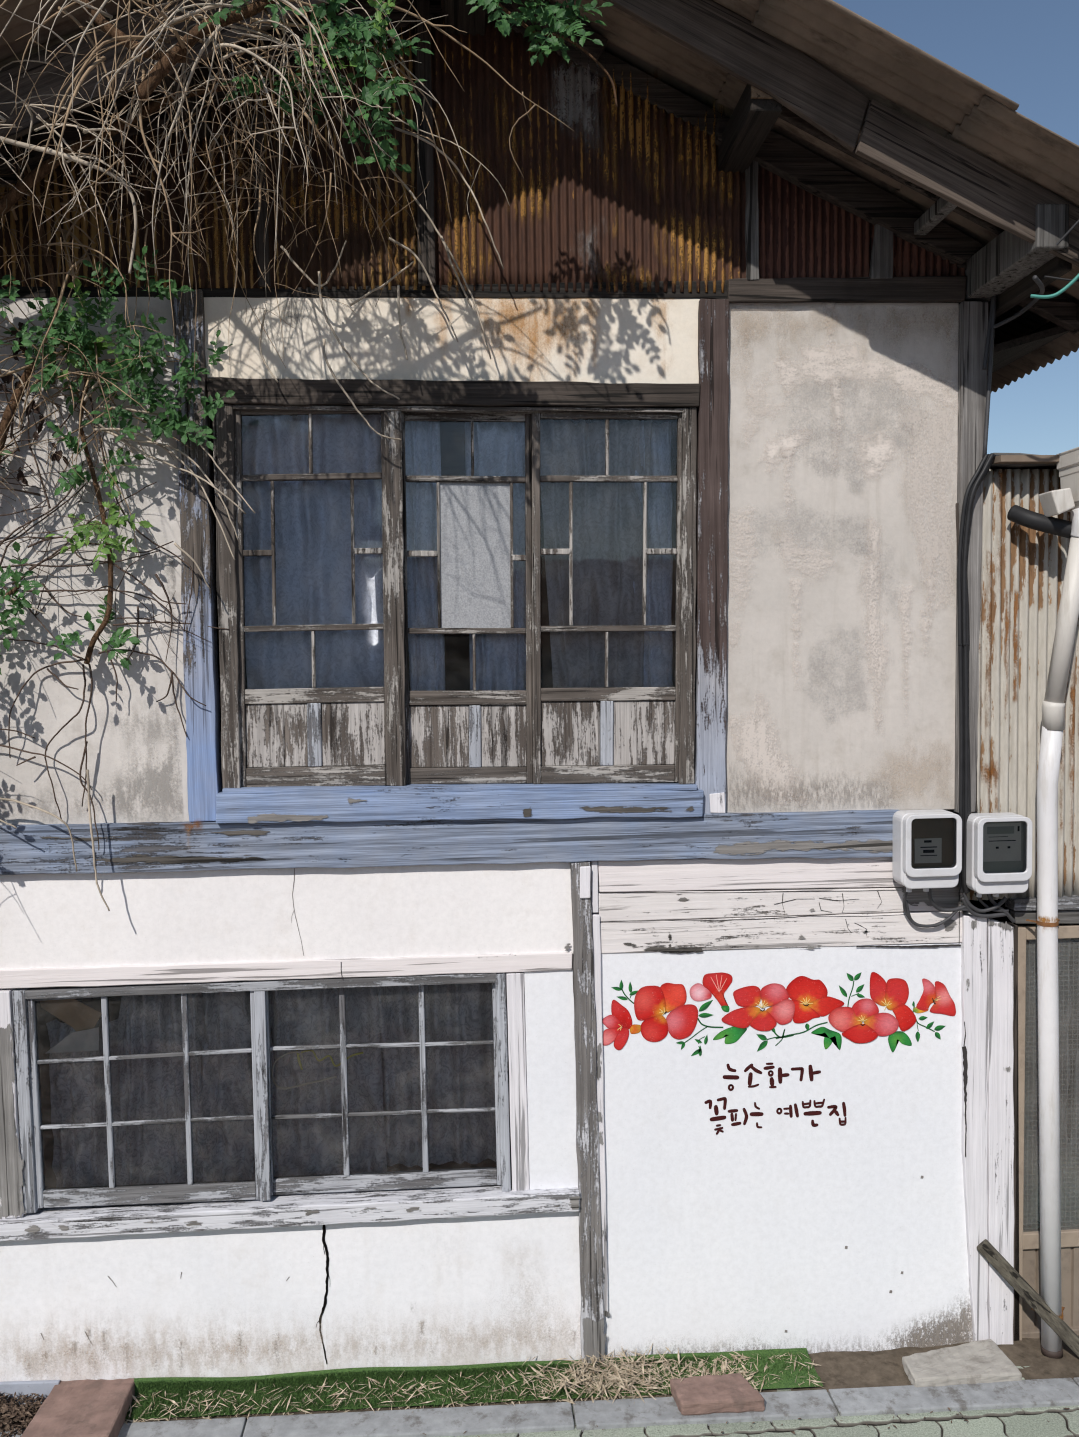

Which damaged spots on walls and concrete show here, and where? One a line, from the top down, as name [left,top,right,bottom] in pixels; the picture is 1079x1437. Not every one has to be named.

rust [979,533,1019,709]
rust [1061,676,1076,792]
rust [984,765,997,808]
peeling [212,813,328,837]
peeling [86,854,265,864]
peeling [902,884,1014,931]
peeling [624,934,703,953]
peeling [556,1196,580,1210]
crack [316,1225,330,1364]
leakage [898,1305,973,1348]